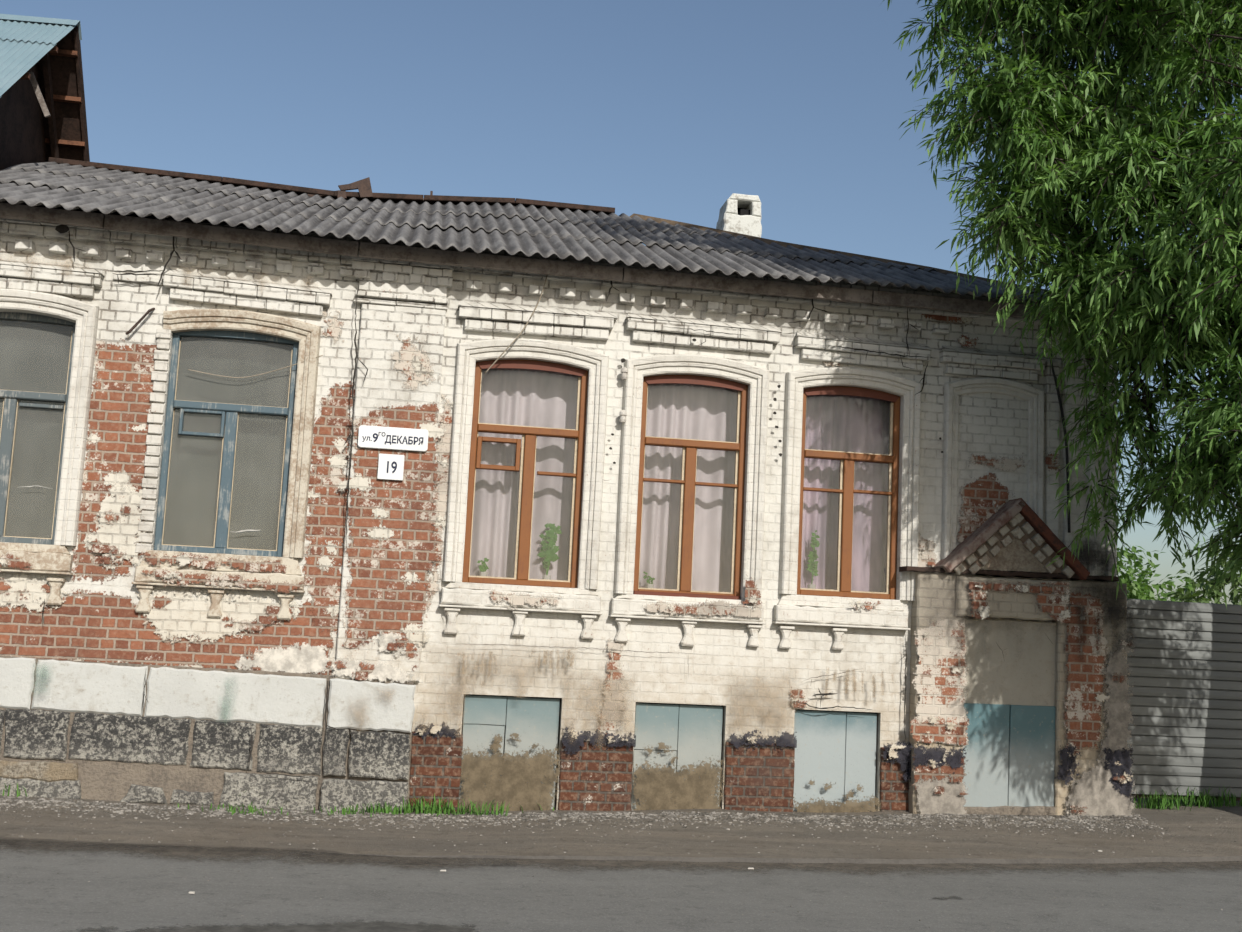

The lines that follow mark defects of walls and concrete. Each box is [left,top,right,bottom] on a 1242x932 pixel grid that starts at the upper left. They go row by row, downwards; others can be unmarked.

peeling [0,335,454,681]
peeling [957,453,1025,543]
peeling [416,724,442,735]
peeling [887,579,1134,799]